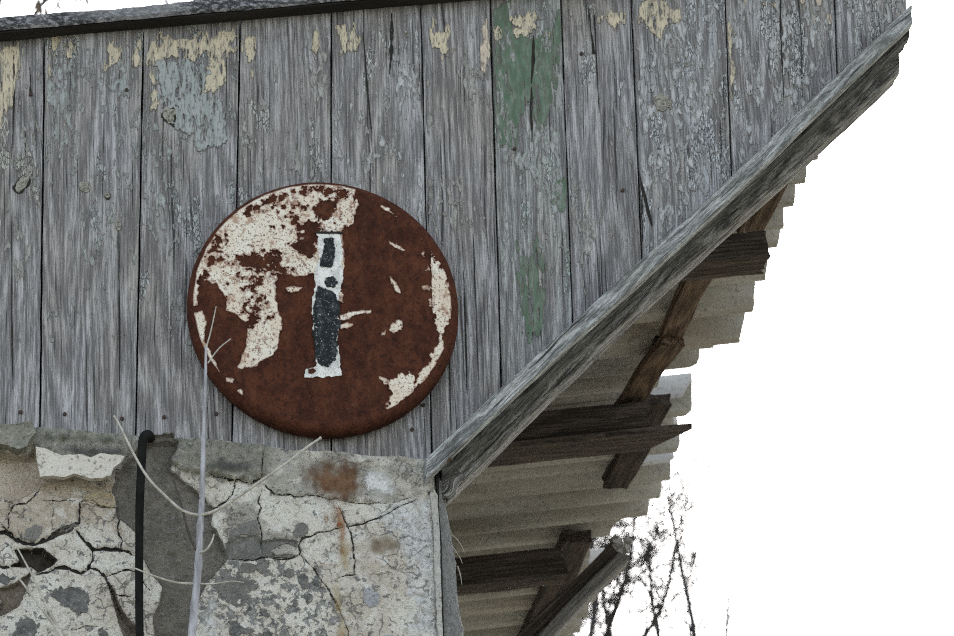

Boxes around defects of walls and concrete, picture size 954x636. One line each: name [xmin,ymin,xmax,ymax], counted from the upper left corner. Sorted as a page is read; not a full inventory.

peeling [0,42,21,129]
peeling [101,28,256,151]
peeling [427,17,456,61]
peeling [478,3,561,149]
peeling [638,0,682,39]
peeling [515,234,553,344]
flaking render [0,523,78,636]
crack [0,490,150,620]
flaking render [35,432,320,636]
crack [208,452,415,636]
corrosion [306,458,363,553]
crack [436,472,444,636]